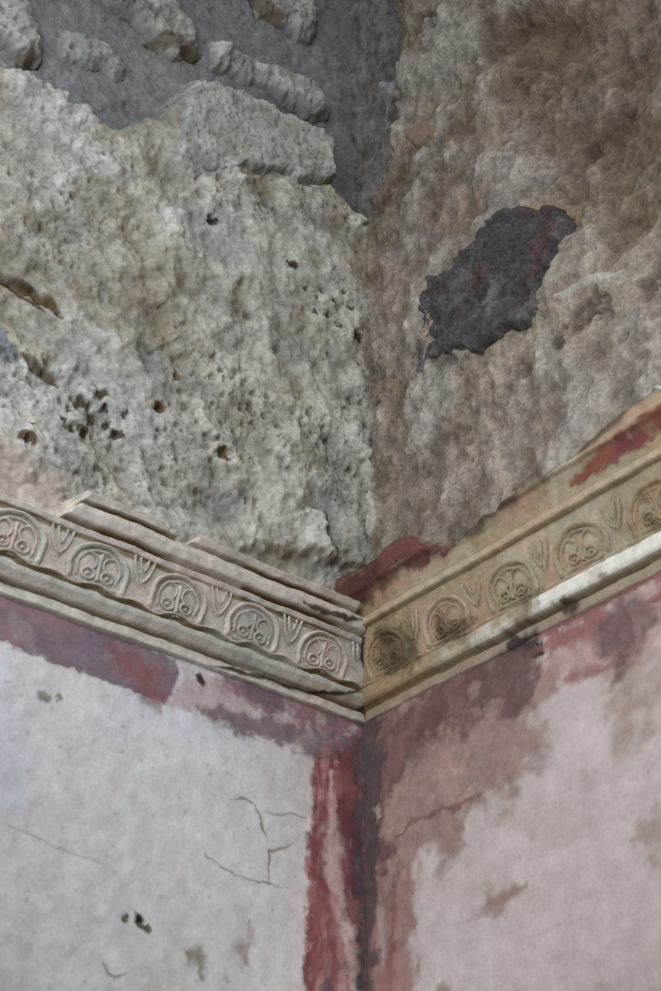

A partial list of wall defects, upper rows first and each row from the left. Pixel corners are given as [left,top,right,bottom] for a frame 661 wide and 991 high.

crack [237,796,290,887]
leakage [350,646,554,991]